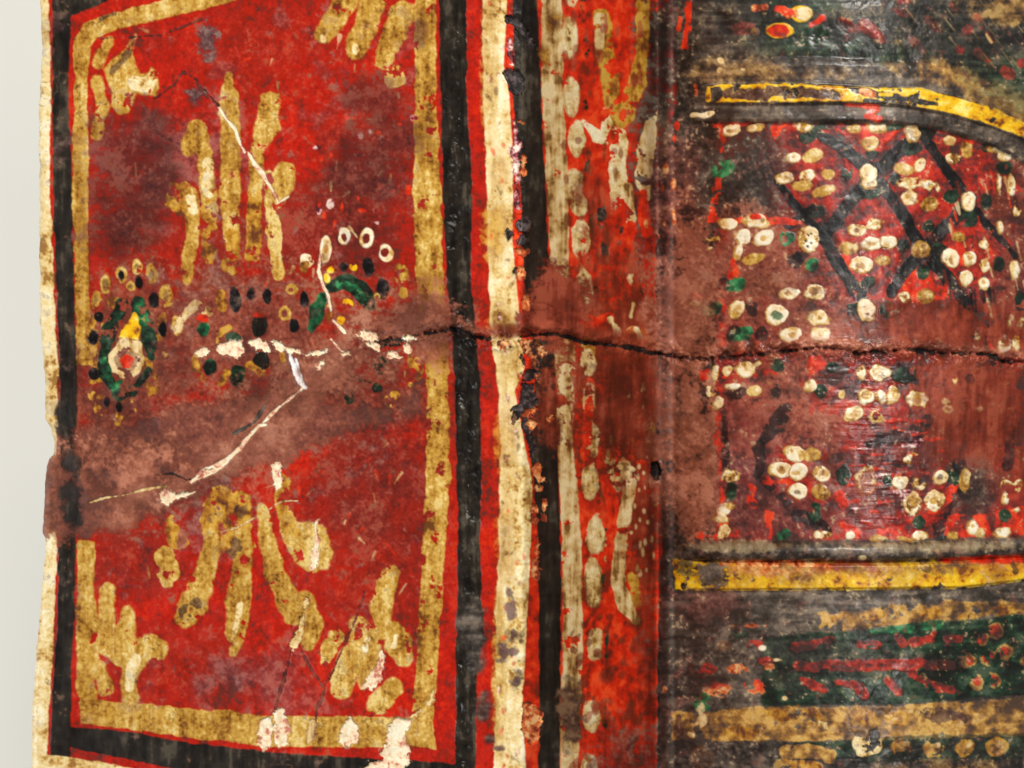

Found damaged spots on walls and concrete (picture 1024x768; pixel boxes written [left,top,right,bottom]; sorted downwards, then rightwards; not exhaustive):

crack [99,18,203,39]
peeling [502,15,535,96]
crack [154,71,289,204]
peeling [505,120,533,281]
peeling [195,337,328,370]
crack [376,327,491,344]
crack [520,332,1024,364]
damp [42,295,462,546]
peeling [271,462,284,492]
peeling [257,707,291,752]
peeling [338,716,359,749]
peeling [365,689,436,768]